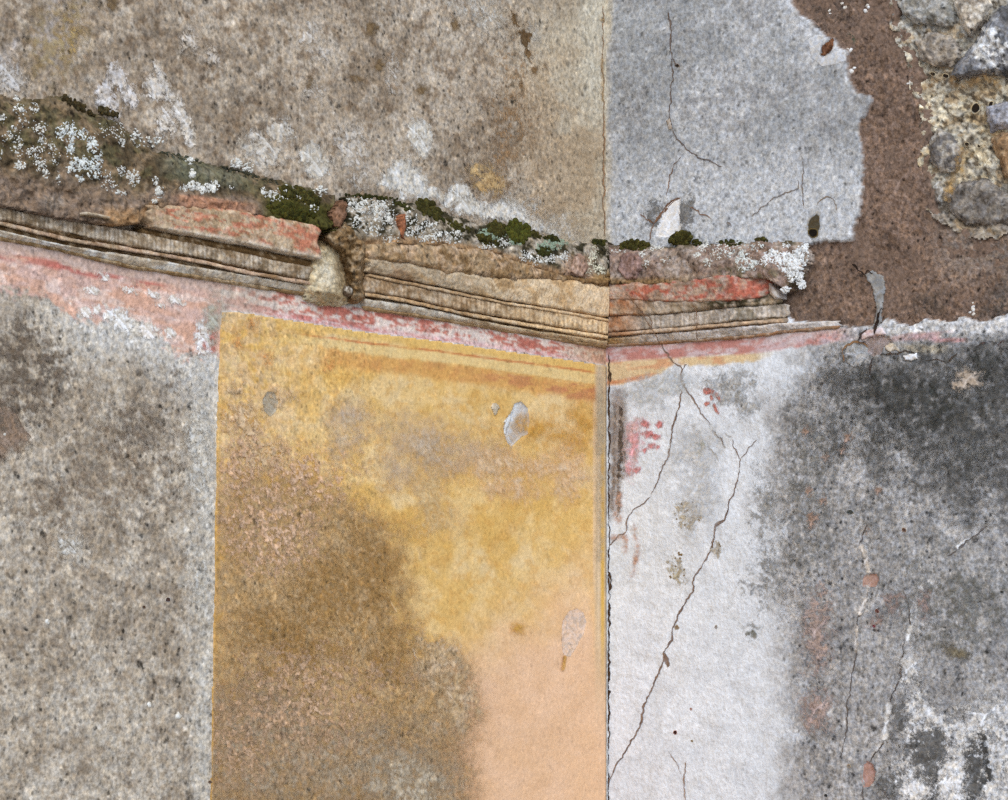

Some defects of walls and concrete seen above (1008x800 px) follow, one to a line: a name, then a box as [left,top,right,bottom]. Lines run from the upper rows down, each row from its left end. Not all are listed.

damp [0,57,26,91]
damp [94,60,196,147]
crack [640,12,722,240]
spalling [781,0,1008,367]
damp [0,370,483,800]
spalling [491,402,530,446]
crack [608,294,755,800]
crack [840,588,869,758]
damp [738,337,1008,650]
crack [861,591,911,800]
damp [875,541,1008,800]